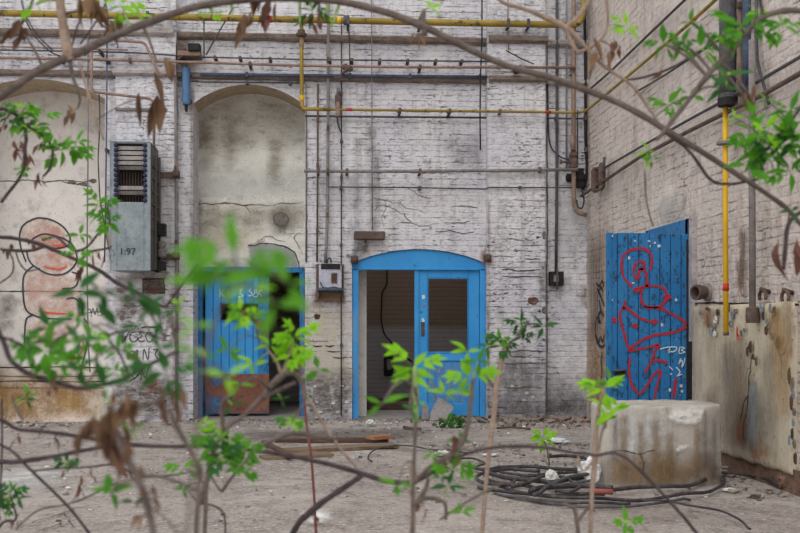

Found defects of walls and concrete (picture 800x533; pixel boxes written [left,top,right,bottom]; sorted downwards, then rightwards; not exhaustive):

crack [198,202,308,262]
flaking render [248,212,303,267]
crack [365,186,477,234]
water stain [0,374,97,422]